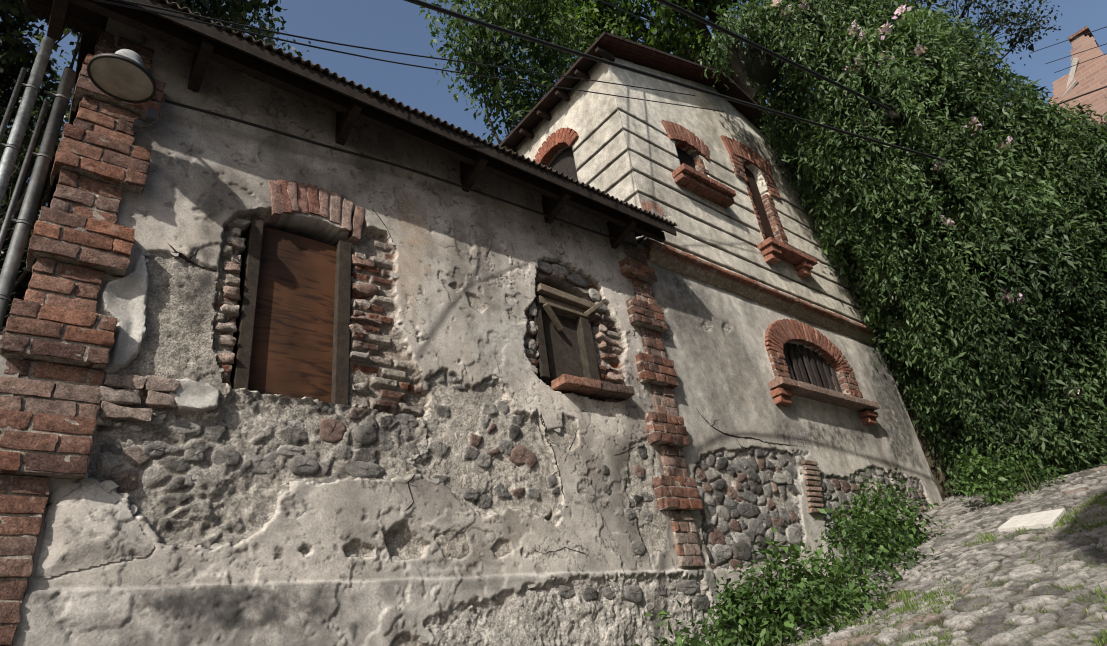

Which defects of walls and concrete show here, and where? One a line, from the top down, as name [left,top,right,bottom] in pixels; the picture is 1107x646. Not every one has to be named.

flaking render [88,210,578,550]
spalling [344,541,373,558]
spalling [384,523,425,561]